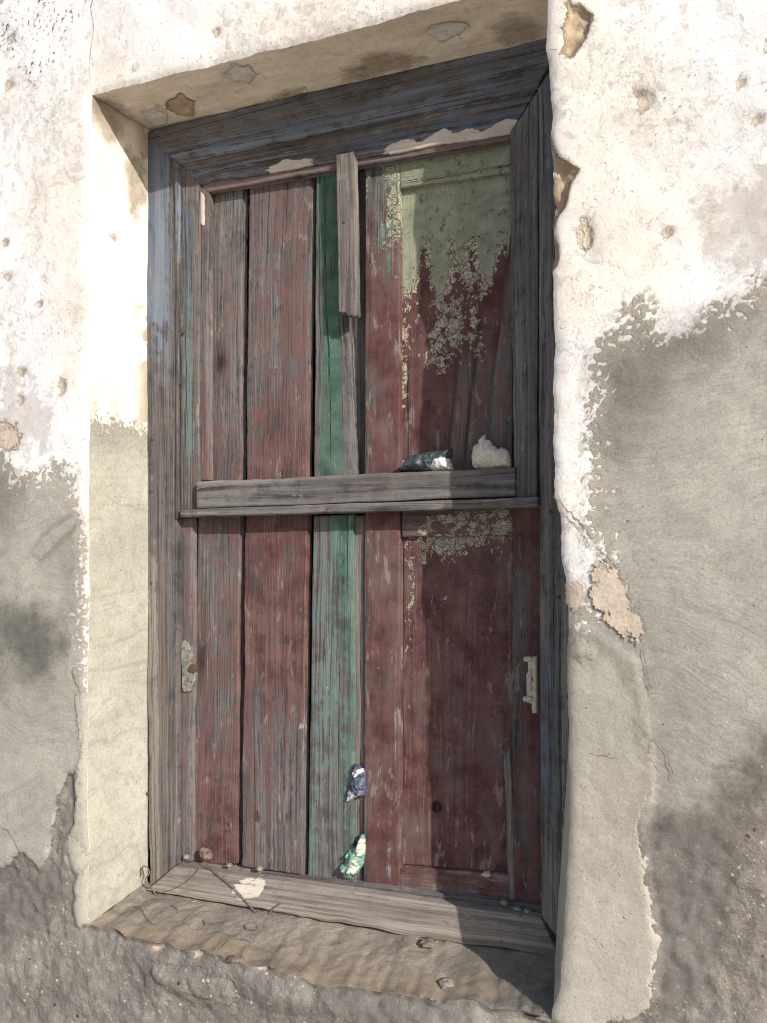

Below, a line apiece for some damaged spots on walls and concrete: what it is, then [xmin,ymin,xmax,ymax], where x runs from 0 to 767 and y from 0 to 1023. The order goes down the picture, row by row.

flaking render [559,0,594,59]
flaking render [165,93,196,117]
flaking render [550,130,580,271]
flaking render [58,376,67,396]
peeling [565,272,767,1023]
peeling [0,418,552,1023]
crack [50,772,73,881]